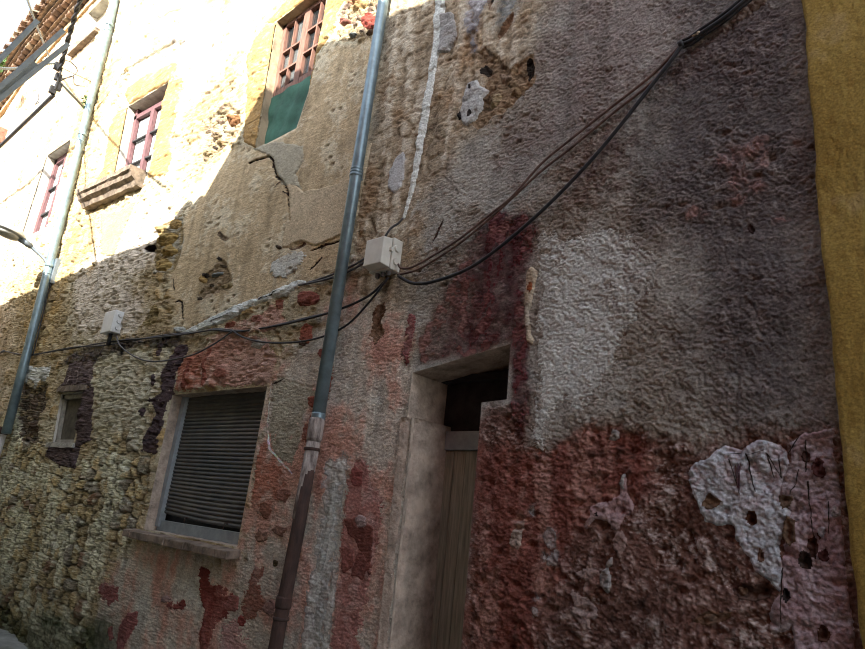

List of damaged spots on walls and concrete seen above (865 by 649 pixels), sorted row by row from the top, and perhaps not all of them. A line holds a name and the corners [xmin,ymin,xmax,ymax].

spalling [498,11,514,40]
spalling [457,45,536,130]
spalling [197,103,242,166]
crack [248,156,290,207]
flaking render [153,216,184,274]
spalling [197,256,233,300]
peeling [297,291,320,306]
peeling [175,299,321,542]
peeling [688,428,855,649]